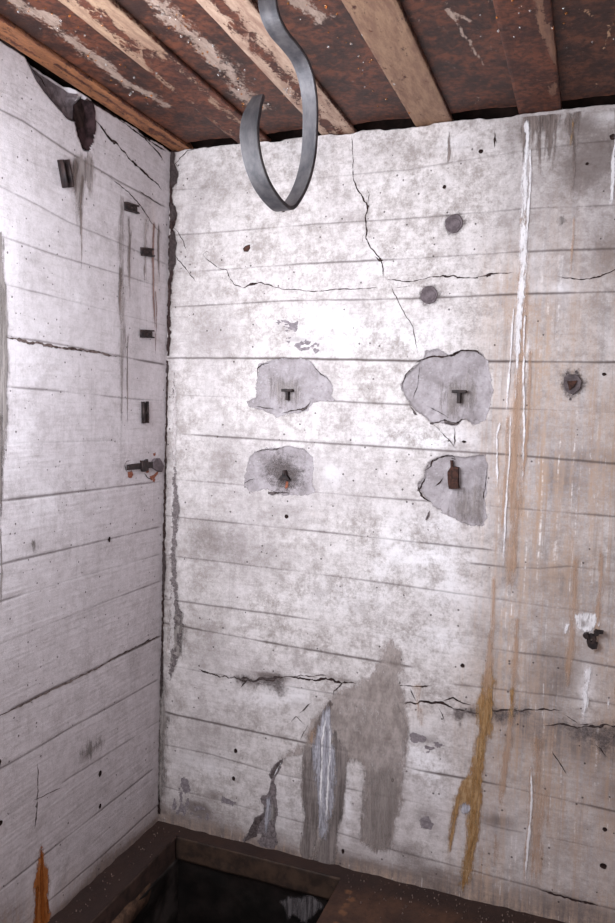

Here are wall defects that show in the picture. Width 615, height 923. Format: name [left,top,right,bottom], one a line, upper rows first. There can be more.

damp [0,232,8,514]
crack [0,98,512,814]
spalling [244,446,315,496]
spalling [247,320,334,418]
spalling [401,349,494,526]
damp [506,111,581,459]
corrosion [33,846,51,923]
crack [35,765,63,826]
spalling [89,759,341,923]
damp [287,640,408,864]
corrosion [448,632,495,890]
crack [400,685,615,757]